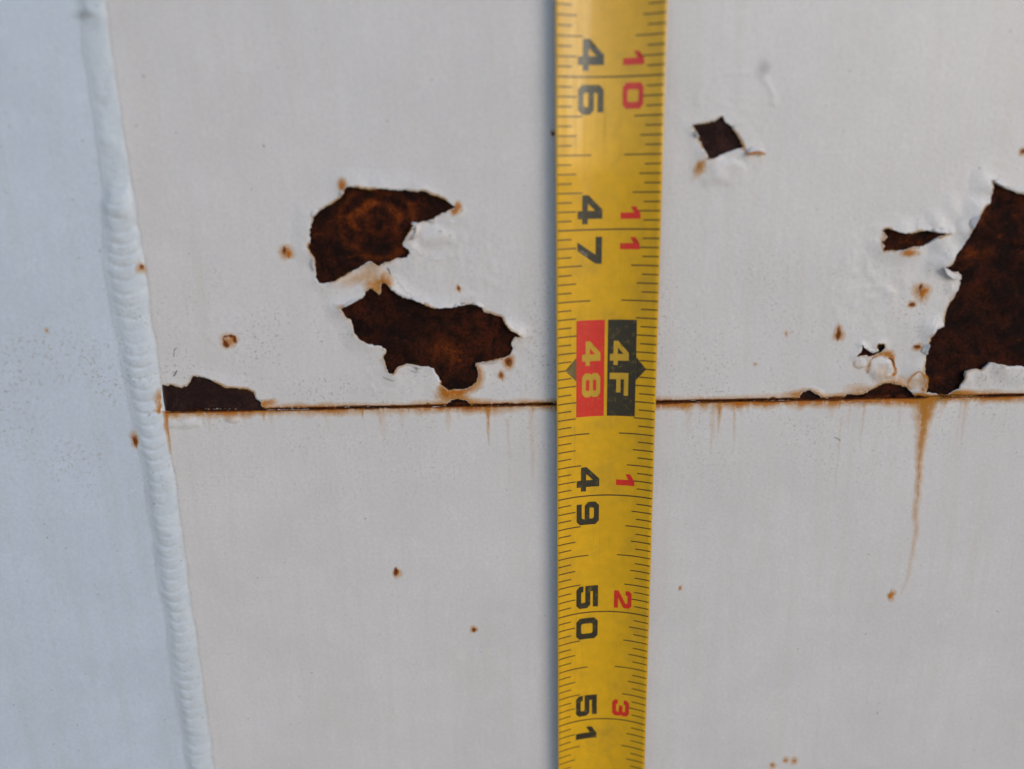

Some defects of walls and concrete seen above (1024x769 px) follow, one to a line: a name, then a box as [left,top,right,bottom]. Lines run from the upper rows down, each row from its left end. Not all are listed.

rust [223,335,237,347]
rust [157,401,557,437]
rust [656,392,1024,476]